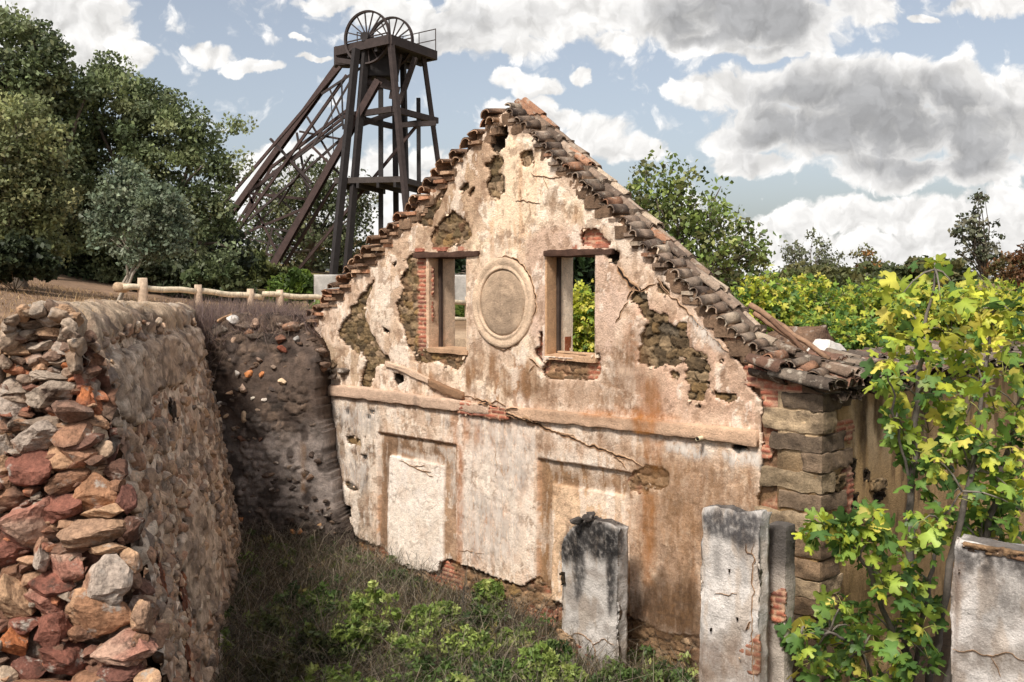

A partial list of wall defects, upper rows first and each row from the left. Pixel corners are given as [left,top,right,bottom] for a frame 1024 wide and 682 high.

spalling [487,125,509,200]
spalling [522,150,535,167]
spalling [420,187,472,248]
spalling [582,228,620,264]
spalling [337,280,390,387]
spalling [392,255,467,370]
spalling [618,282,737,408]
crack [466,396,645,469]
spalling [627,465,669,495]
spalling [358,540,592,666]
water stain [573,548,584,597]
water stain [607,538,615,609]